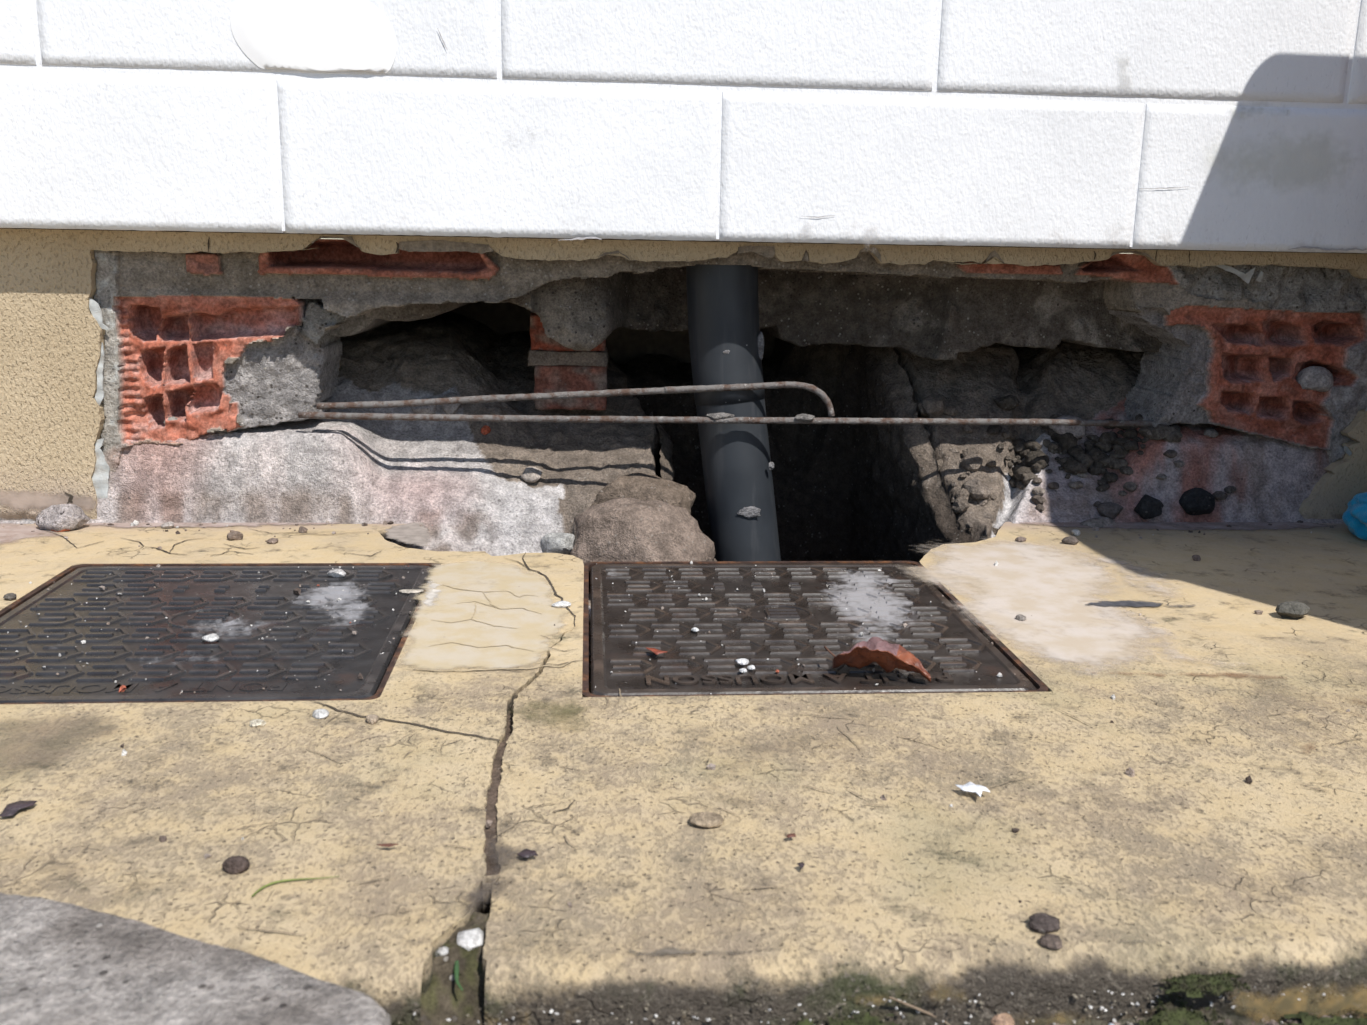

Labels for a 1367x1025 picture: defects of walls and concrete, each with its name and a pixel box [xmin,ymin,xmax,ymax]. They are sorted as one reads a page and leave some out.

spalling [399,240,494,254]
flaking render [1111,251,1367,317]
flaking render [89,250,132,498]
spalling [298,381,1153,435]
flaking render [1324,343,1367,465]
crack [307,552,583,1025]
crack [237,926,303,935]